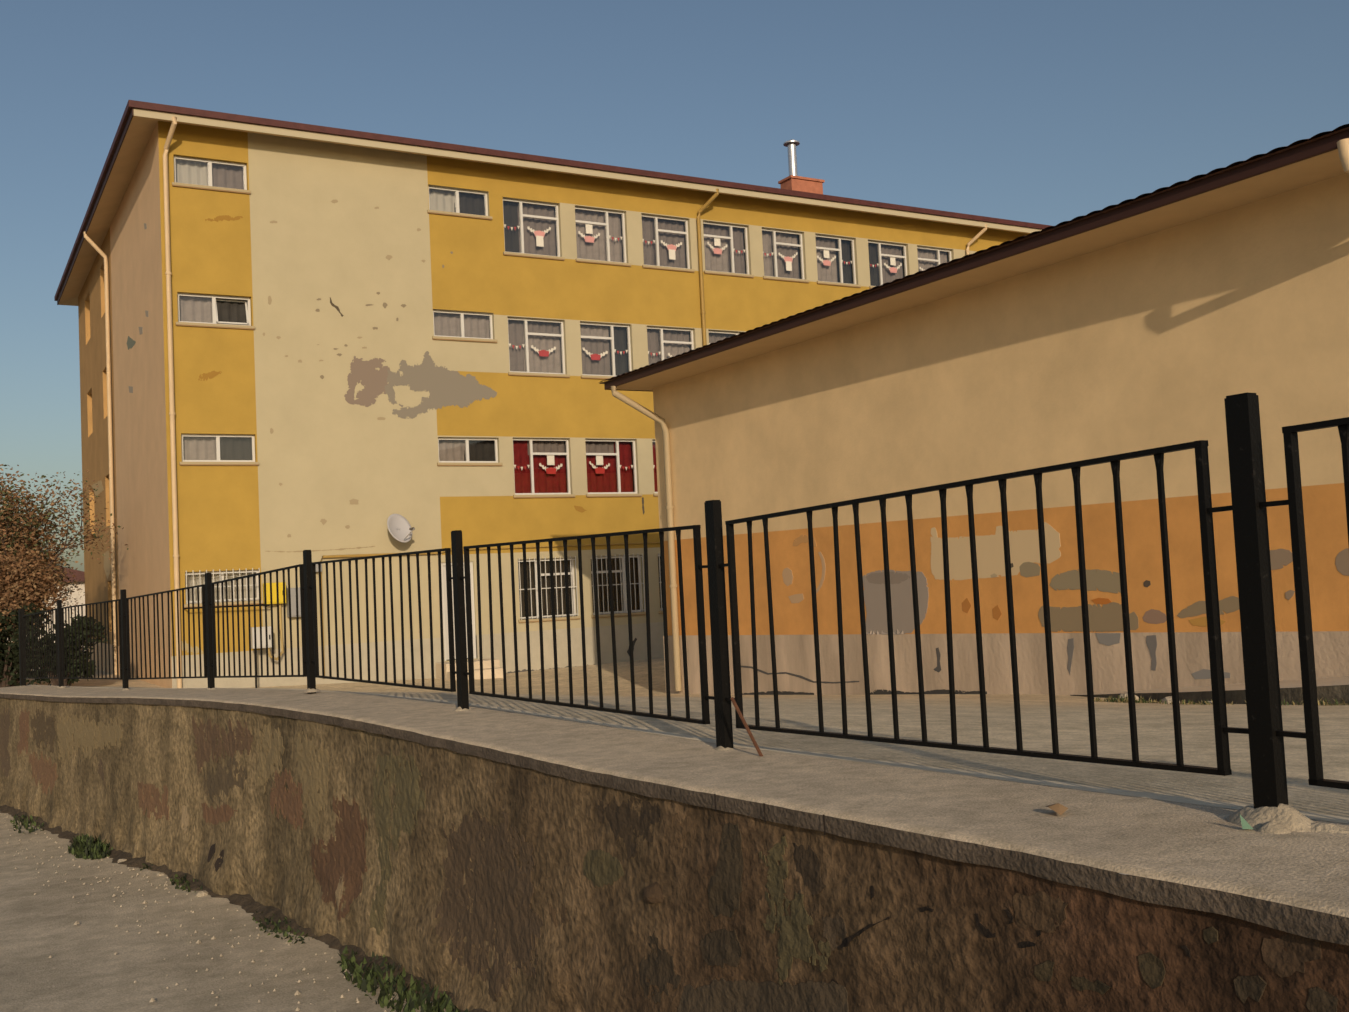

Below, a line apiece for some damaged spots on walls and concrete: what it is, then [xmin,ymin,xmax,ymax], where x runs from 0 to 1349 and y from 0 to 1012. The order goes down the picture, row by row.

peeling [319,327,497,420]
peeling [930,522,1061,580]